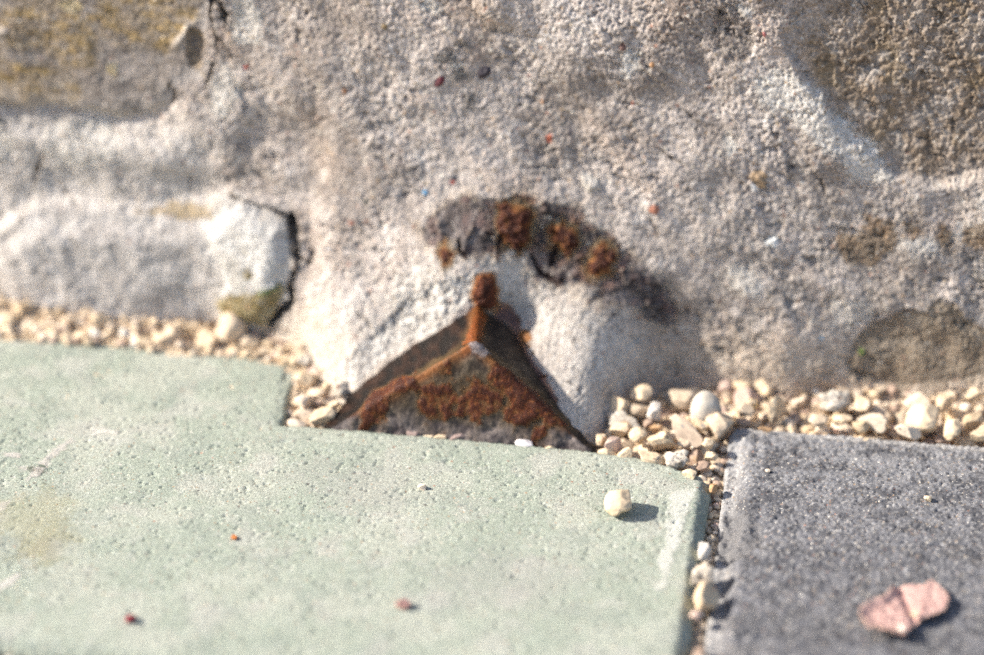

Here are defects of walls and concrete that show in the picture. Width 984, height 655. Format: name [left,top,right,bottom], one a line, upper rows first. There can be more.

crack [165,79,178,114]
crack [204,0,232,91]
crack [229,193,317,330]
corrosion [422,193,679,329]
corrosion [358,303,568,447]